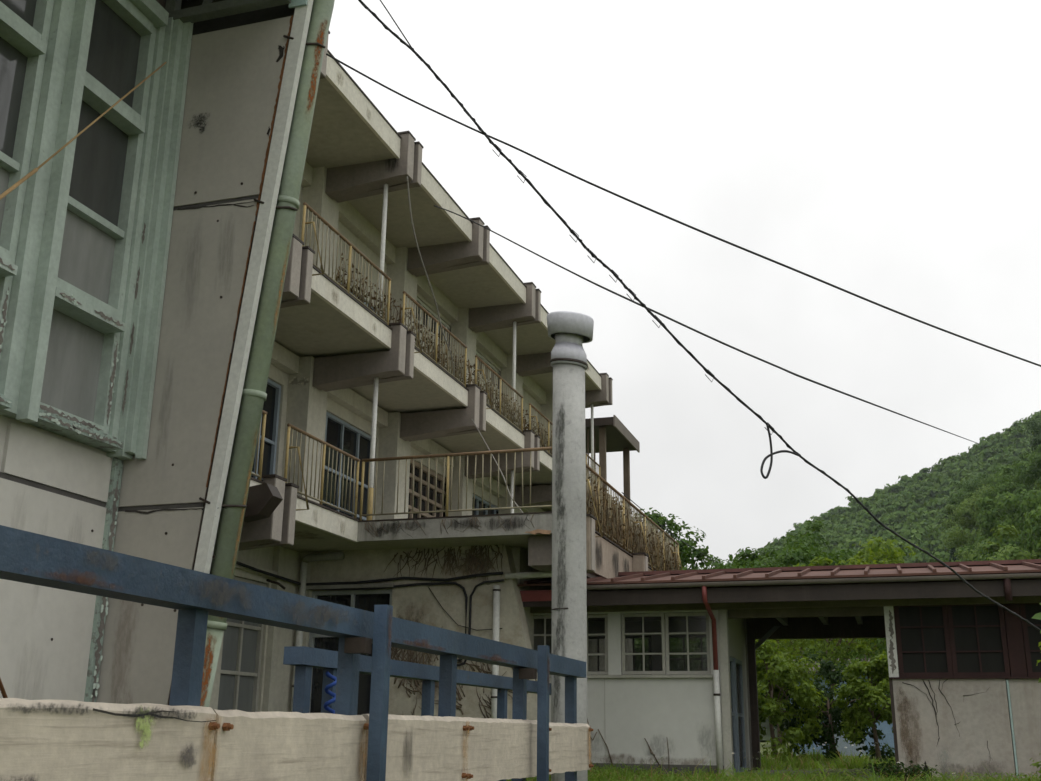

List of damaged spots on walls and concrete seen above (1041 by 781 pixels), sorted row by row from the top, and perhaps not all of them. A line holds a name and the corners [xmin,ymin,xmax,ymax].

corrosion [307,21,327,110]
peeling [39,310,135,446]
leakage [555,411,564,518]
leakage [554,547,566,654]
corrosion [200,636,213,707]